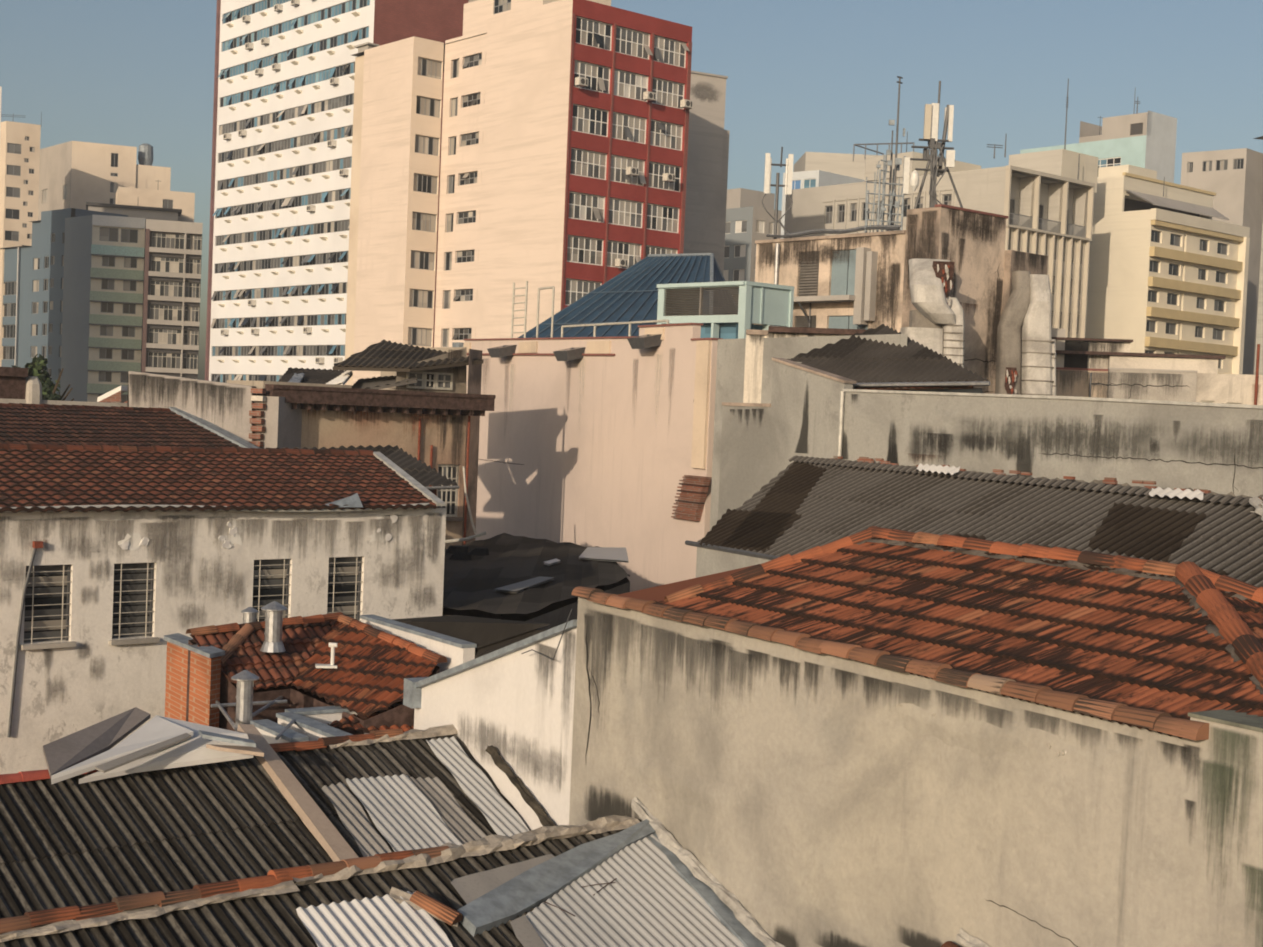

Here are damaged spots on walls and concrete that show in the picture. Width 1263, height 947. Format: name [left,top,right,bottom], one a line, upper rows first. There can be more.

damp [759,209,1004,327]
damp [985,280,1003,376]
damp [887,426,898,464]
damp [912,415,1157,477]
damp [0,513,441,603]
damp [539,611,819,691]
damp [835,669,1005,727]
damp [588,791,637,821]
damp [1162,730,1249,831]
damp [775,930,797,947]
damp [822,933,858,947]
damp [903,931,941,947]